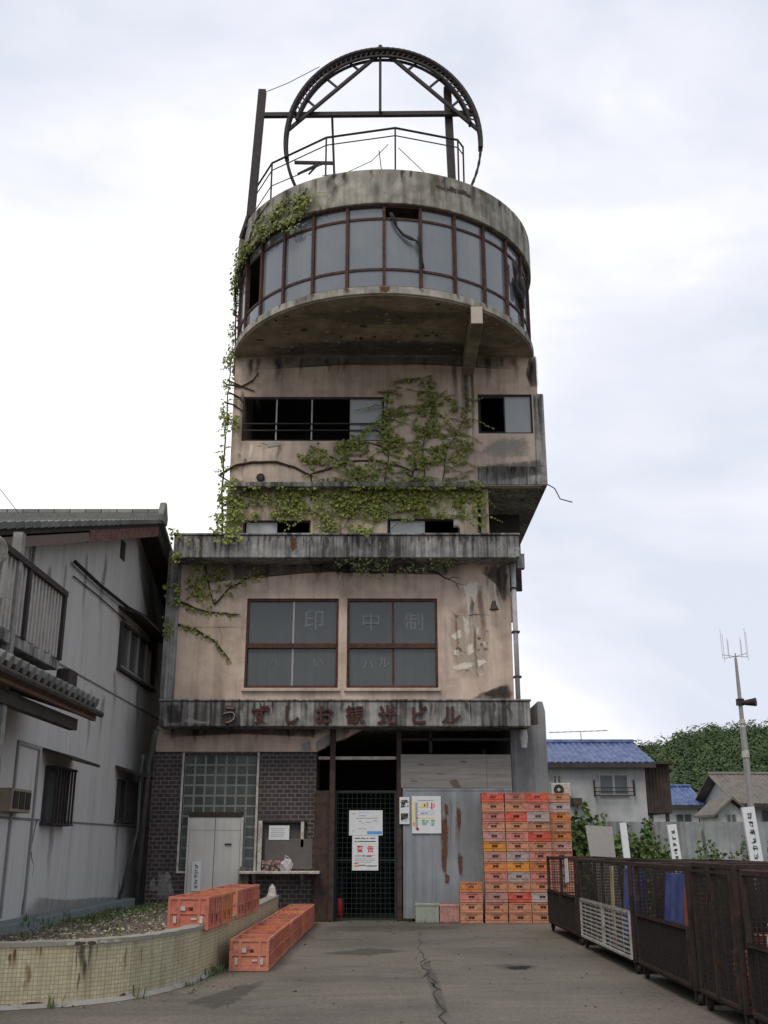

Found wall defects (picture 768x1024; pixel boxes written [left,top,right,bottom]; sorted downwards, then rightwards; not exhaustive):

leakage [527,361,537,385]
peeling [451,612,491,678]
leakage [463,566,507,648]
corrosion [442,804,462,883]
crack [416,932,454,1024]